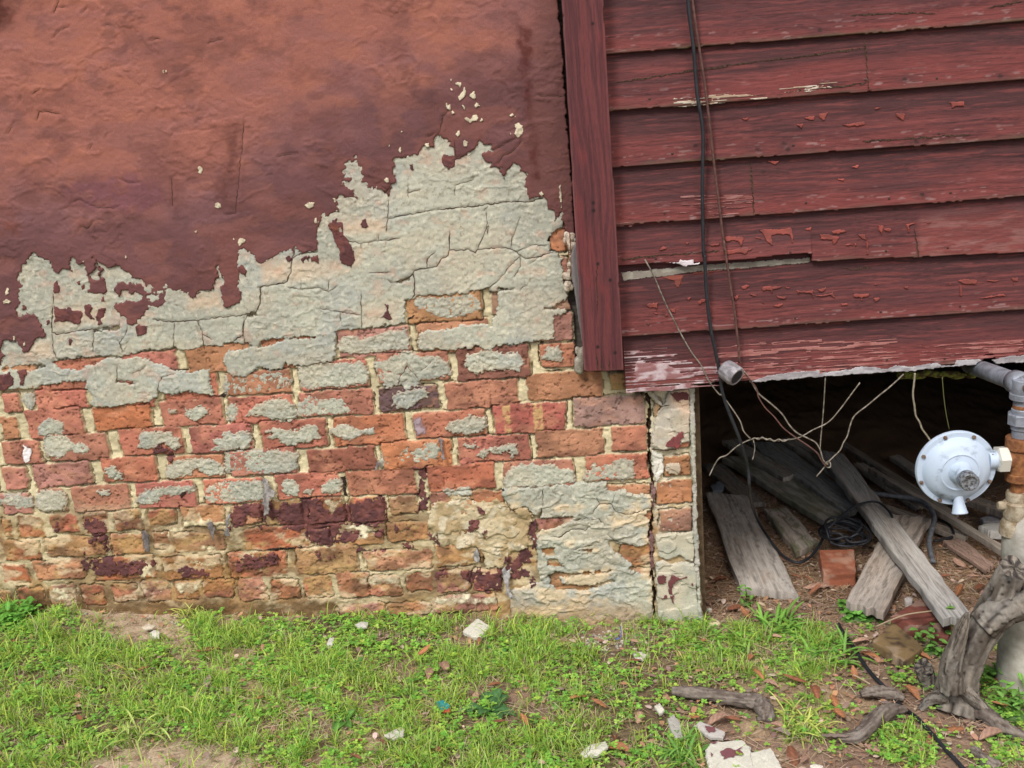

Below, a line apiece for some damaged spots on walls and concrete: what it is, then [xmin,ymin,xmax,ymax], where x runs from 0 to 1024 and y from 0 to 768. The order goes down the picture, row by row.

peeling [673,94,767,107]
peeling [779,82,838,93]
crack [349,112,551,298]
peeling [677,195,755,217]
peeling [622,228,810,287]
peeling [0,79,576,560]
peeling [734,284,880,307]
crack [506,394,677,611]
spalling [375,337,1024,624]
peeling [80,517,157,579]
peeling [177,565,209,579]
peeling [236,552,279,573]